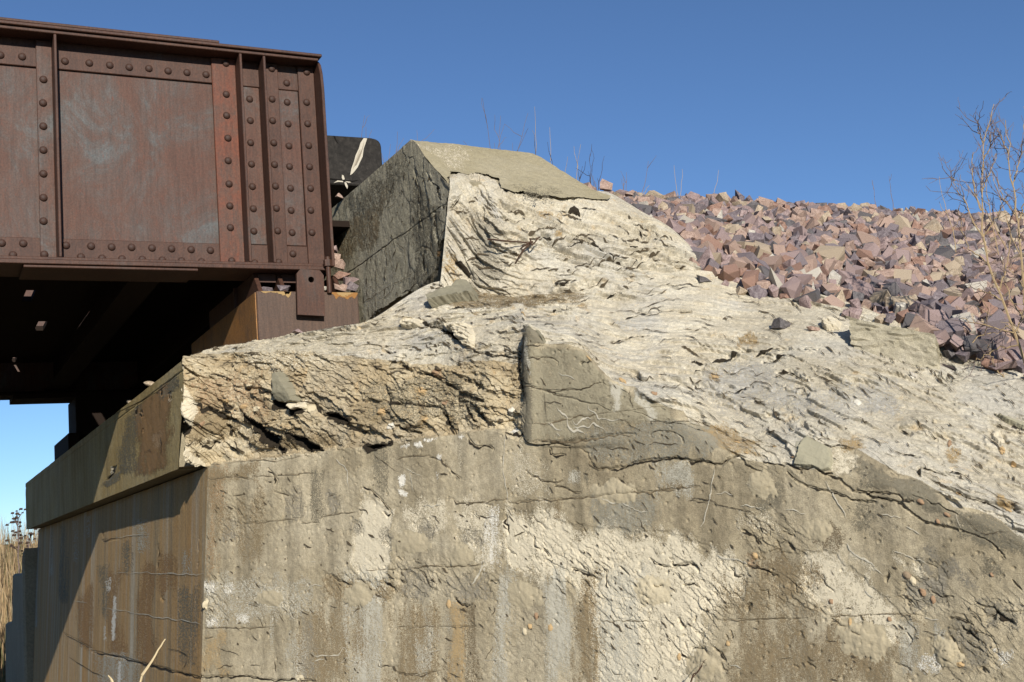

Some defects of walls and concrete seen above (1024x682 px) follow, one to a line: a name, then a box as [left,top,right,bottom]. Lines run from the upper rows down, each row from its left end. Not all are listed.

water stain [269,370,519,682]
crack [354,173,444,312]
water stain [540,557,656,682]
spalling [202,158,1024,541]
crack [378,344,1009,629]